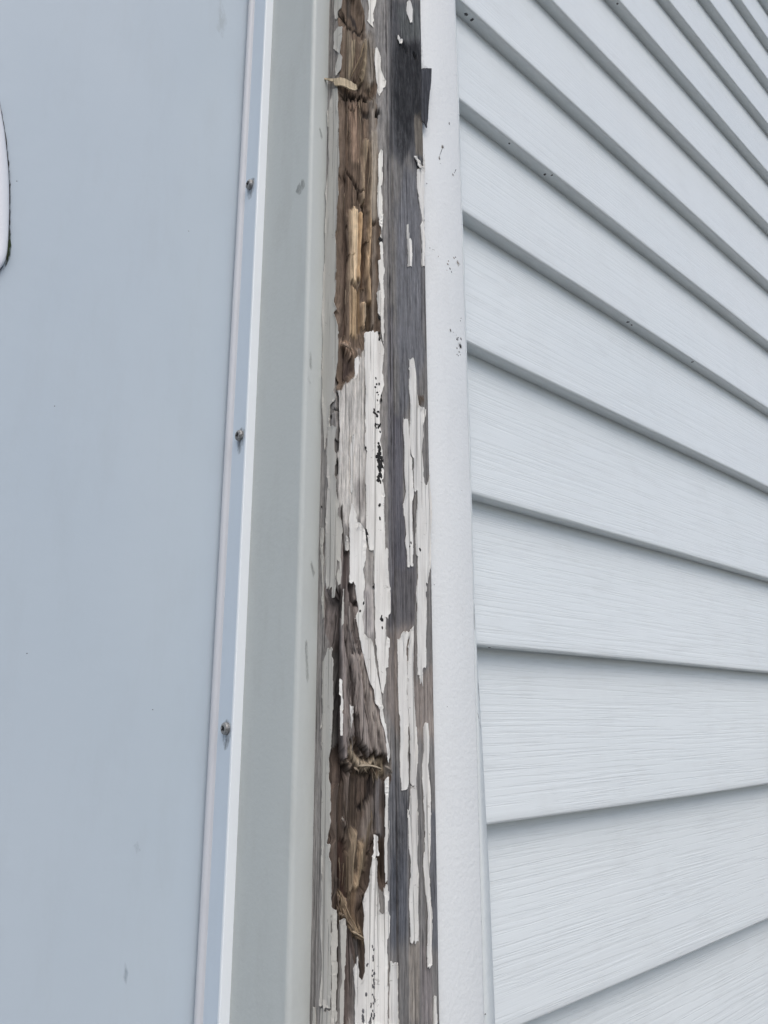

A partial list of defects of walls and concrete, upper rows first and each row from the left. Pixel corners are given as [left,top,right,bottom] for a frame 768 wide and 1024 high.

peeling [312,0,433,1024]